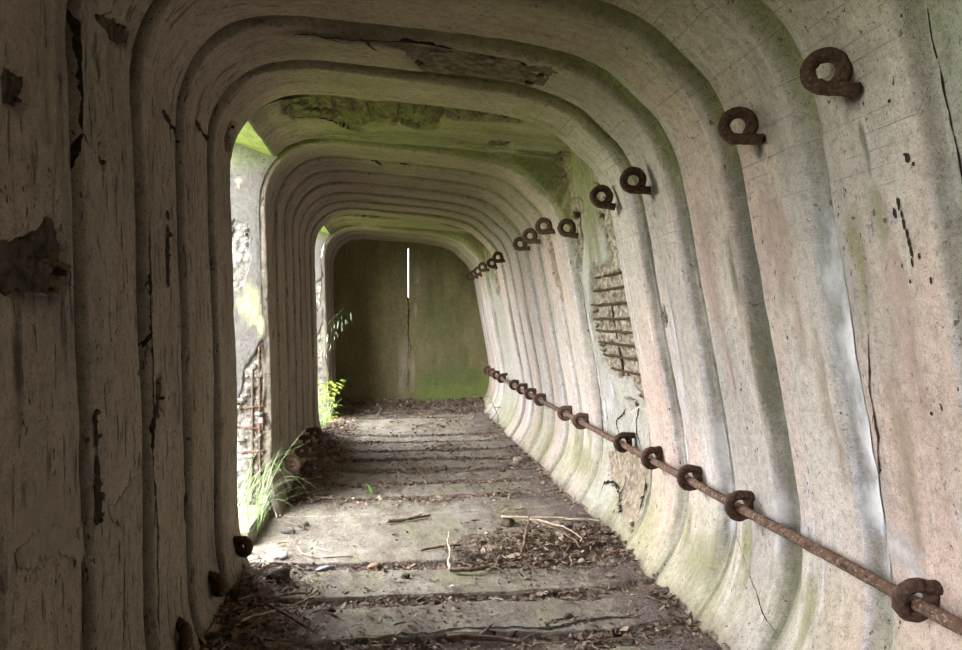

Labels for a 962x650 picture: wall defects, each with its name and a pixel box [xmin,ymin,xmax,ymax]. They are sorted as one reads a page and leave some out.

spalling [0,67,23,107]
spalling [95,14,129,46]
spalling [399,48,559,86]
crack [927,8,962,180]
spalling [0,216,71,296]
spalling [551,151,645,407]
crack [405,297,413,391]
crack [579,270,646,516]
crack [868,343,886,519]